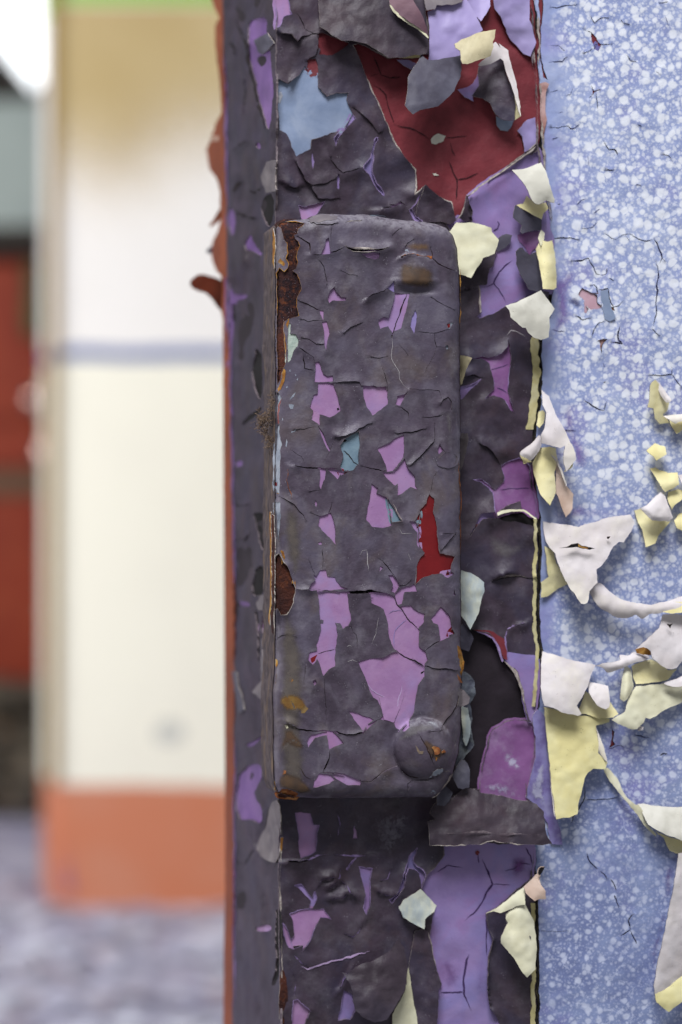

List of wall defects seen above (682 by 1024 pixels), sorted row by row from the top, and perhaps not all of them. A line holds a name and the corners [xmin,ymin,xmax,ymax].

crack [530,0,660,170]
peeling [249,0,557,412]
crack [526,199,662,488]
peeling [647,379,682,434]
crack [494,513,543,709]
peeling [338,390,682,1024]
peeling [233,737,282,1013]
peeling [257,884,331,984]
peeling [291,999,311,1024]
peeling [295,812,320,859]
crack [530,900,558,1024]
crack [587,855,636,942]